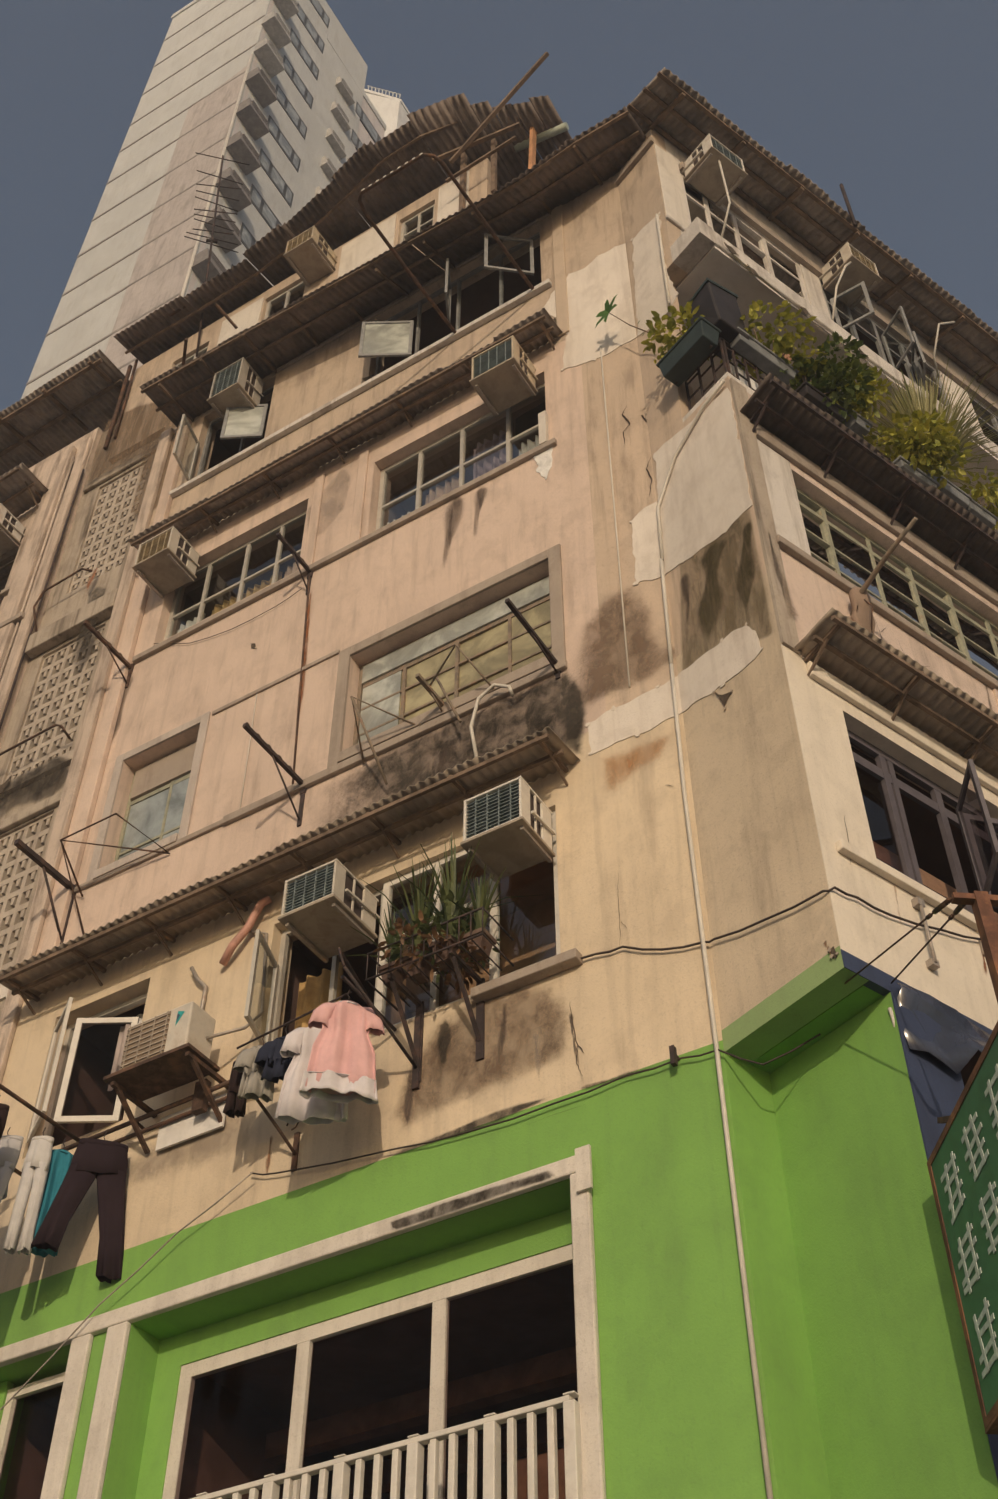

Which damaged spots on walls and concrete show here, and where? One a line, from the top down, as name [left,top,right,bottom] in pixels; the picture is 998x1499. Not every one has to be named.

water stain [682,523,754,635]
water stain [338,594,675,819]
spalling [712,689,733,710]
water stain [401,990,577,1121]